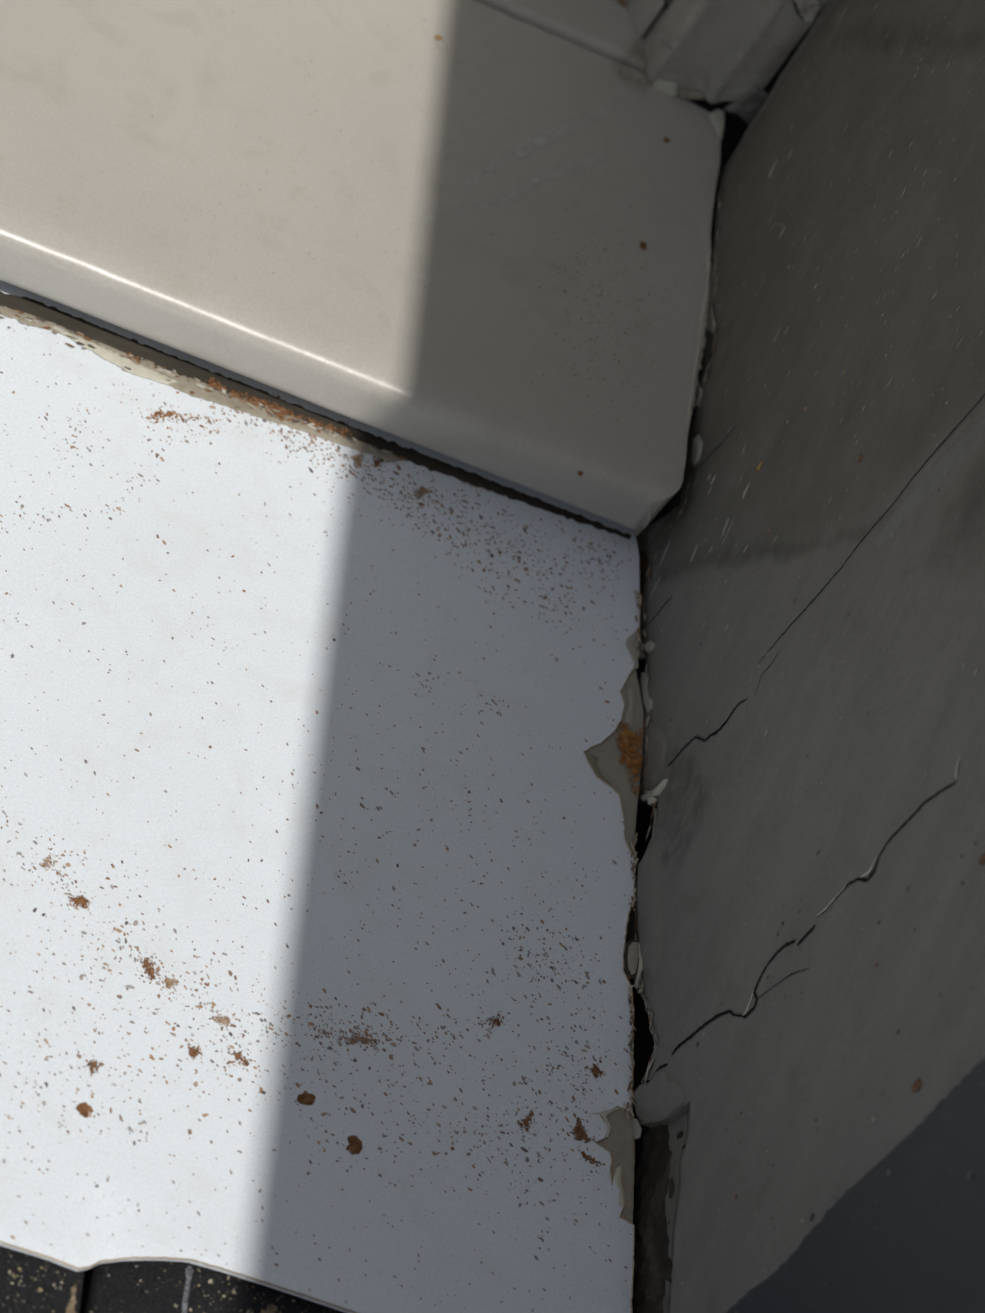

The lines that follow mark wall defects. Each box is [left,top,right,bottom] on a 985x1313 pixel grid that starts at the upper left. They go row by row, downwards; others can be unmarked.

corrosion [607,717,645,797]
spalling [585,462,694,1313]
crack [643,755,961,1083]
crack [667,394,985,767]